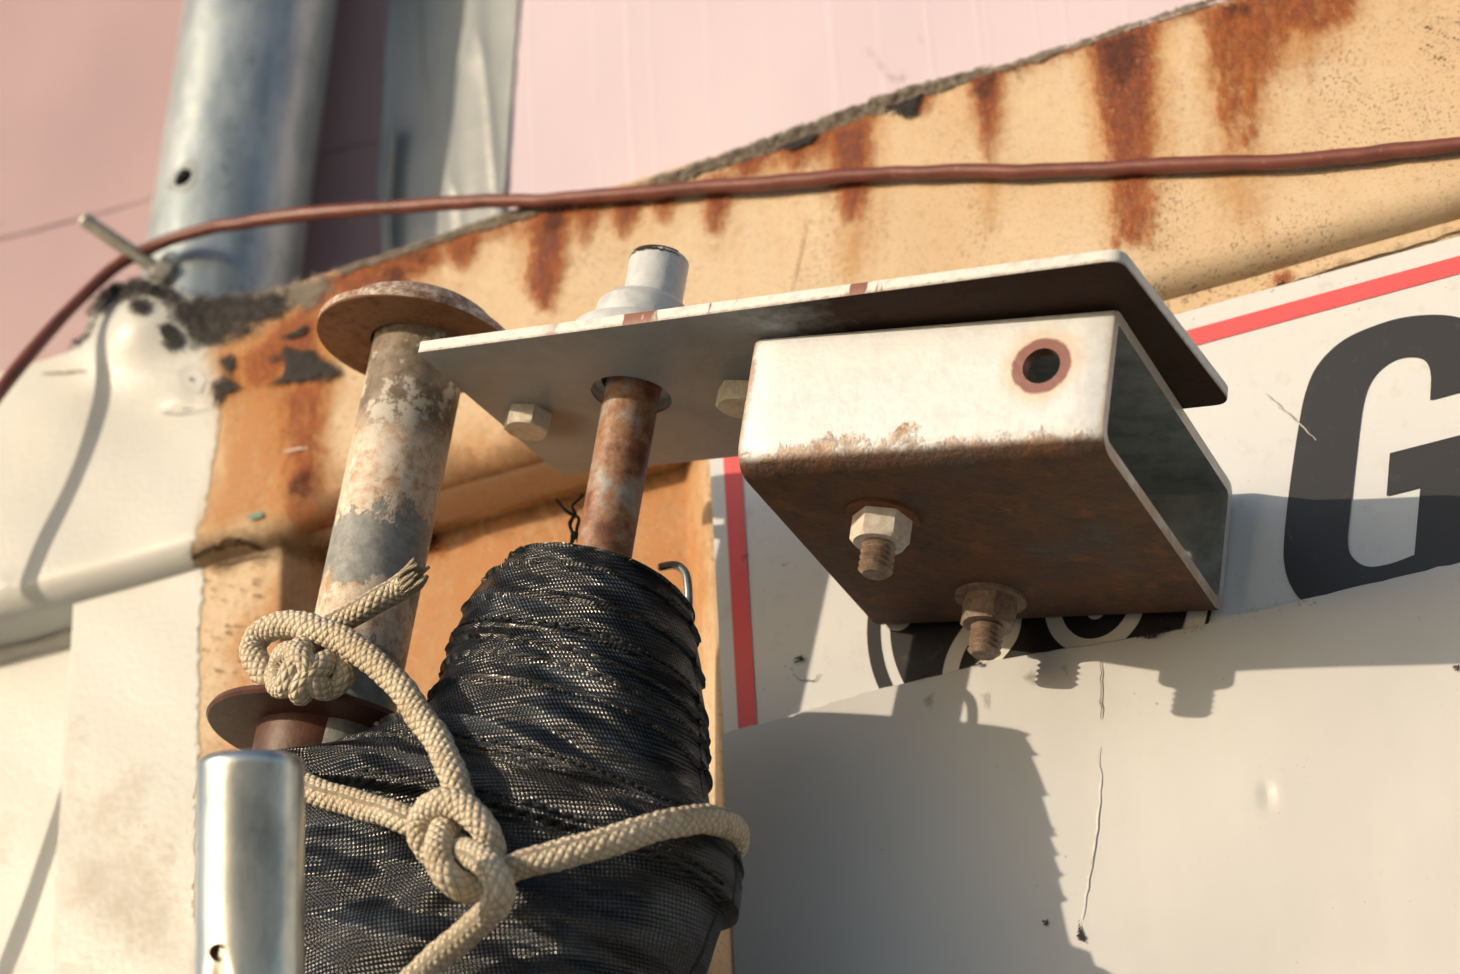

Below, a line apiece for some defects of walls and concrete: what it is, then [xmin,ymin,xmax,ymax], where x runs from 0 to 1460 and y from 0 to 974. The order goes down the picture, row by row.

rust [704,113,874,244]
rust [966,0,1353,249]
peeling [158,352,240,414]
peeling [265,323,340,389]
rust [212,181,678,558]
rust [405,483,588,700]
rust [632,461,703,626]